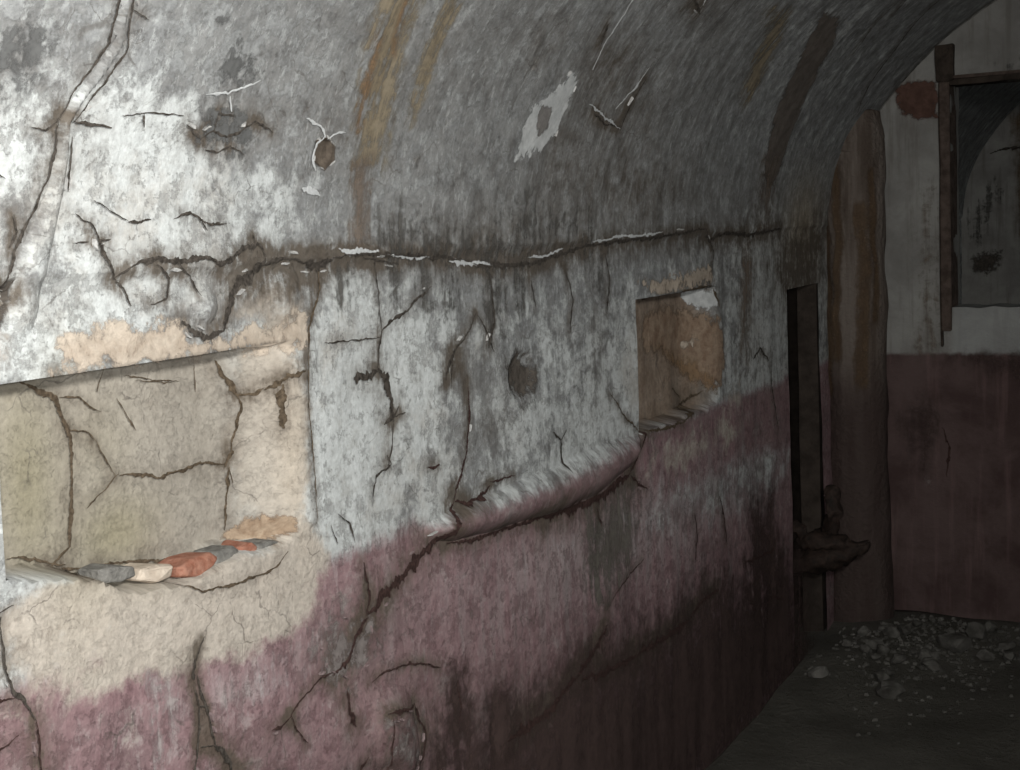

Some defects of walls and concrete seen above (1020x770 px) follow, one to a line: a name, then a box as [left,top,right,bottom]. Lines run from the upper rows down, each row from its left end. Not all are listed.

leakage [196,106,252,158]
leakage [219,38,264,87]
spalling [312,134,335,171]
corrosion [349,0,423,245]
corrosion [411,0,462,125]
peeling [514,71,577,163]
spalling [48,307,308,377]
crack [0,0,781,743]
spalling [220,514,298,540]
crack [0,605,42,770]
crack [192,636,232,770]
leakage [429,488,810,770]